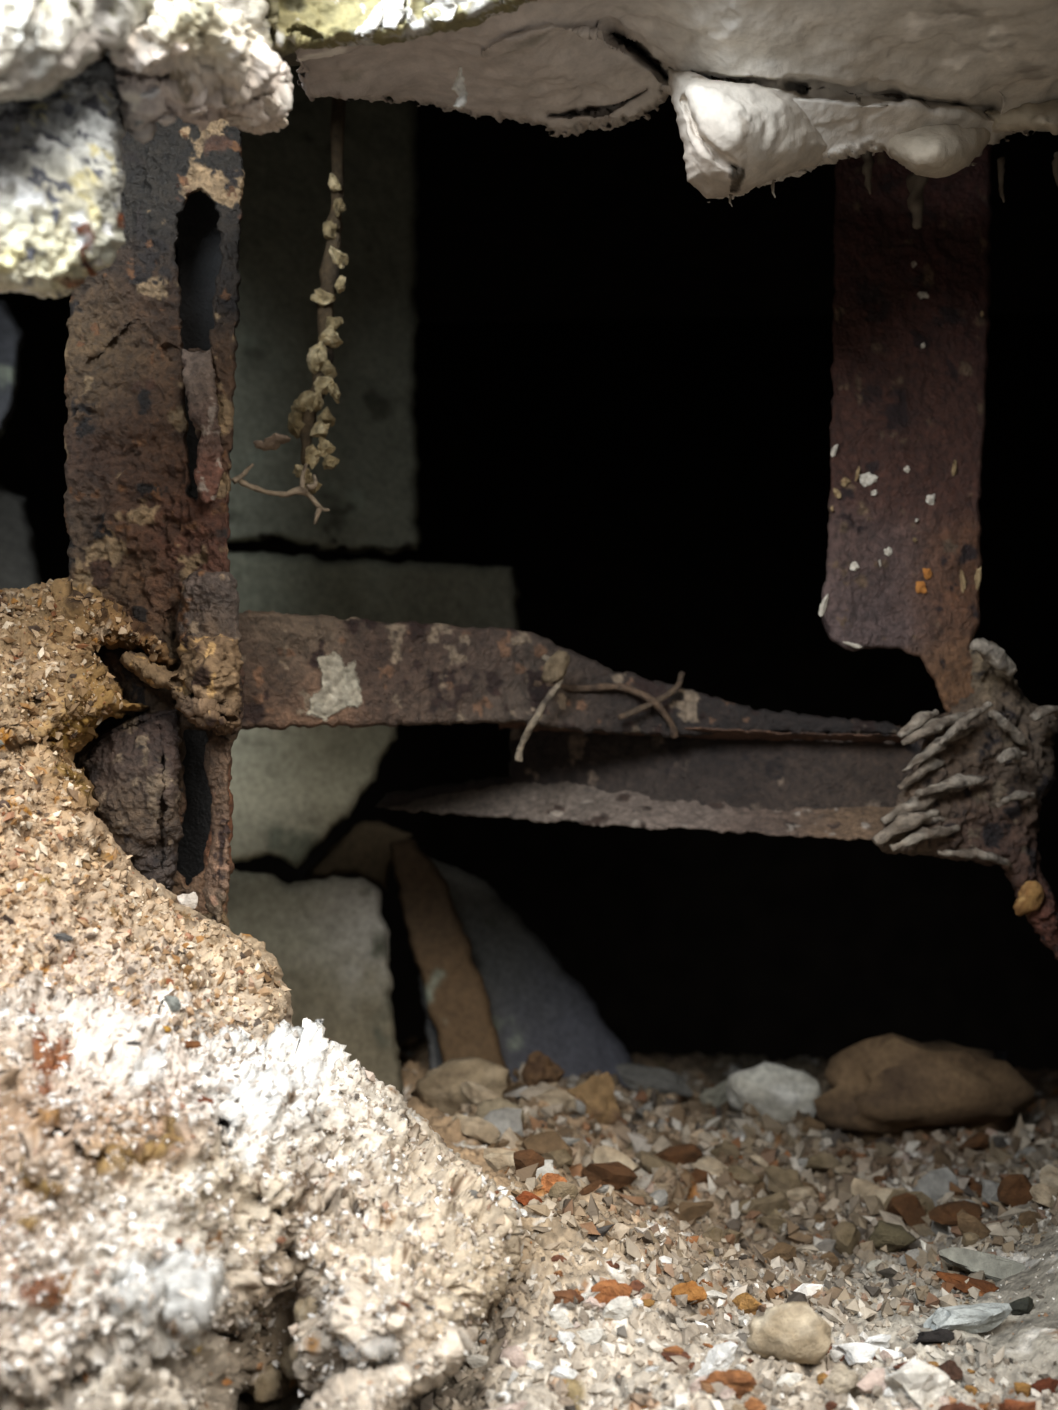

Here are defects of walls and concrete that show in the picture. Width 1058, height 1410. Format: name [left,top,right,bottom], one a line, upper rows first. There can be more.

peeling [0,0,95,92]
flaking render [109,0,294,144]
flaking render [451,67,468,109]
crack [562,32,752,116]
crack [799,86,960,107]
rust [61,222,99,290]
rust [182,349,224,504]
rust [915,568,932,593]
rust [49,716,101,749]
rust [202,732,231,923]
leakage [133,1037,168,1086]
leakage [192,1024,320,1132]